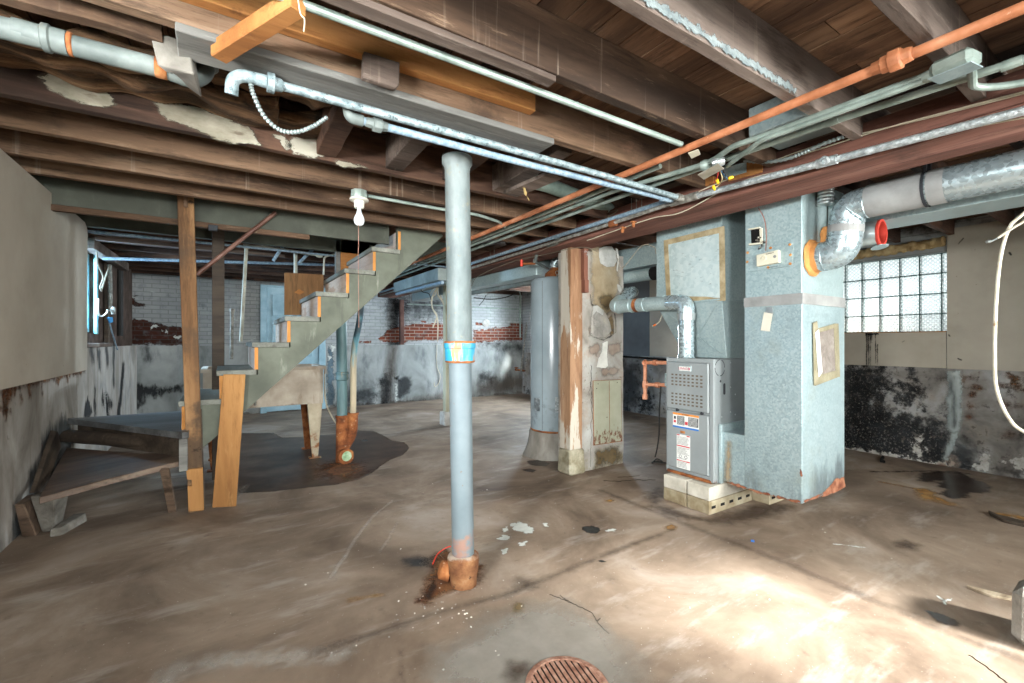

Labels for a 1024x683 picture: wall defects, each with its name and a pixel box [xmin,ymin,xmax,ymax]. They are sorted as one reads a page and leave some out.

peeling [36,73,115,108]
peeling [154,102,262,146]
peeling [272,134,365,168]
flaking render [132,295,182,346]
flaking render [359,320,443,344]
rust [1,387,16,420]
damp [84,345,125,417]
damp [137,383,181,410]
damp [347,342,399,406]
damp [844,333,1024,499]
rust [725,444,845,503]
rust [405,549,457,604]